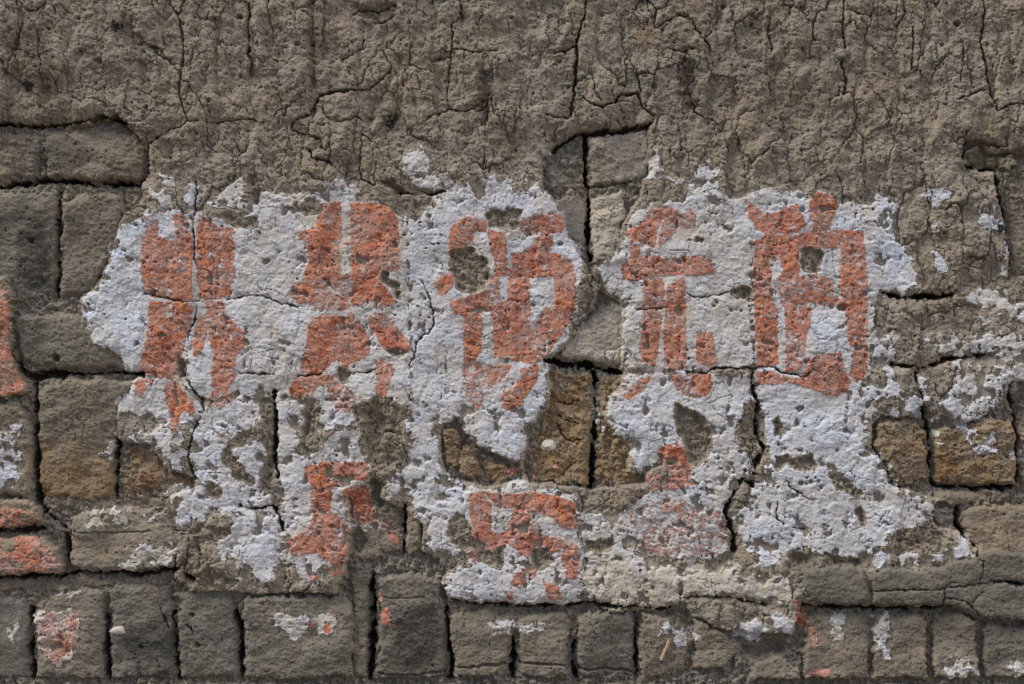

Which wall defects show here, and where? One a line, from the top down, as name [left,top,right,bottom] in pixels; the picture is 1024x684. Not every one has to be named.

crack [147,0,264,165]
crack [290,5,396,167]
crack [426,0,498,121]
crack [544,0,656,120]
crack [646,0,719,57]
crack [840,0,870,96]
crack [895,0,914,71]
crack [957,0,1024,112]
peeling [159,171,176,186]
crack [191,180,199,267]
spalling [174,358,187,378]
peeling [182,127,1024,609]